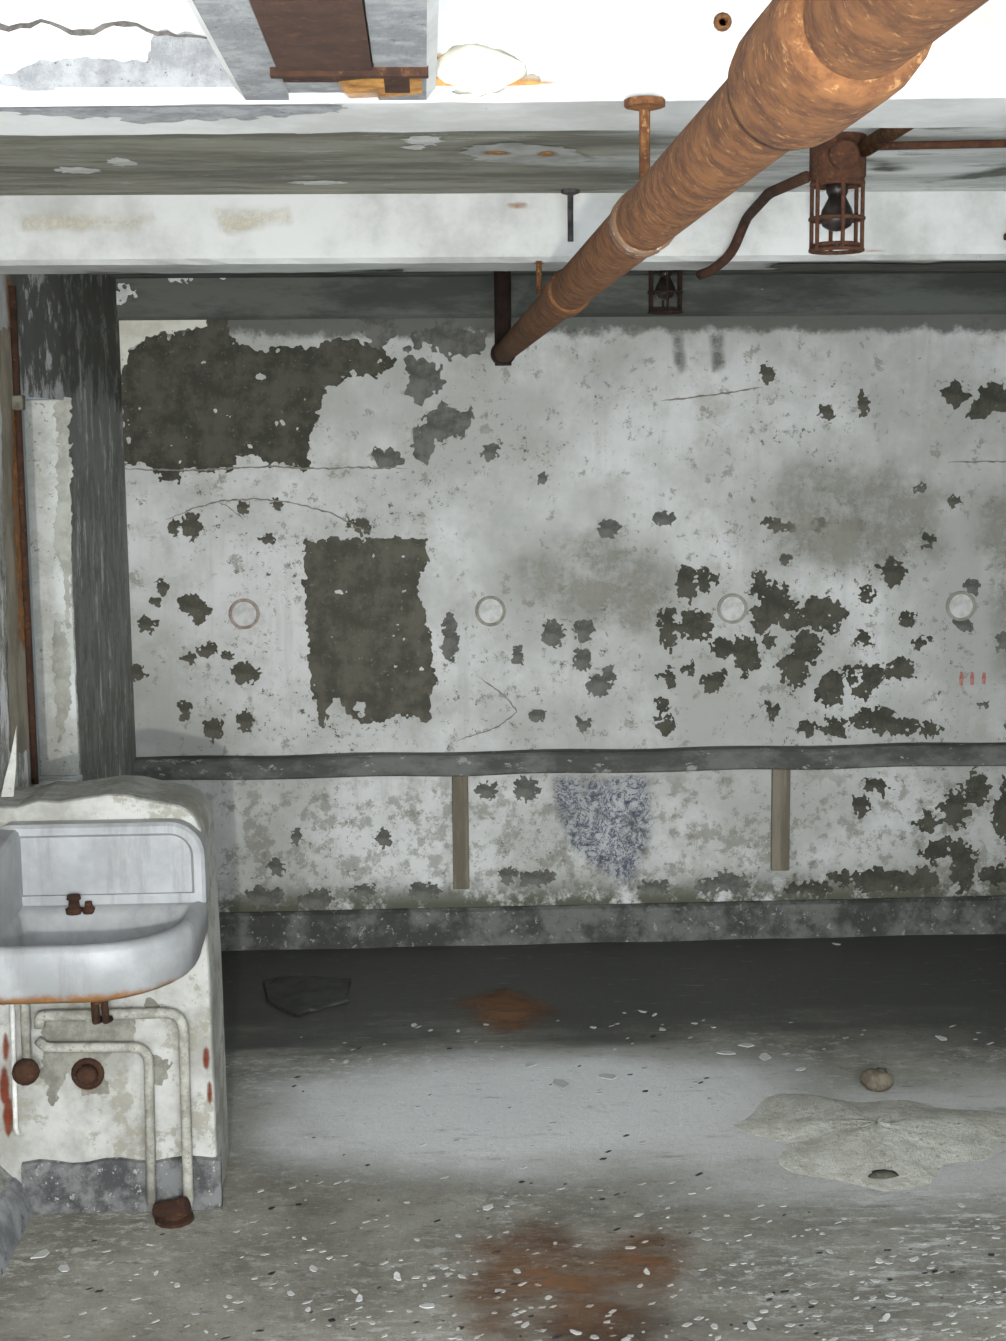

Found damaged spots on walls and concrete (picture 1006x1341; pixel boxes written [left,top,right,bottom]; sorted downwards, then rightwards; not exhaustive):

crack [0,19,207,39]
peeling [87,273,488,485]
peeling [50,397,74,743]
peeling [137,578,213,636]
peeling [167,510,204,543]
peeling [179,640,262,685]
peeling [301,518,460,728]
peeling [541,618,617,698]
peeling [653,553,945,740]
peeling [177,700,255,744]
peeling [782,766,1006,900]
rust [466,1232,676,1341]